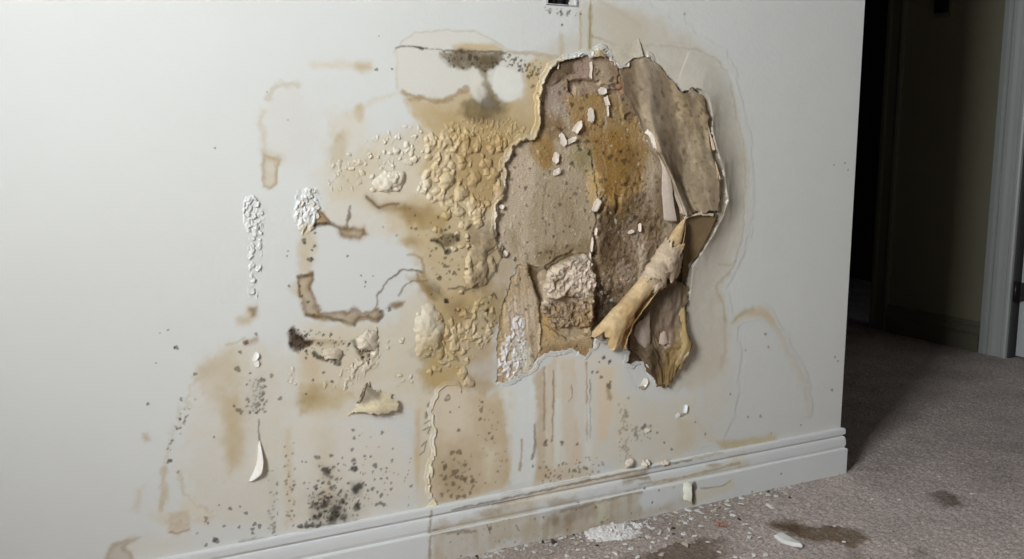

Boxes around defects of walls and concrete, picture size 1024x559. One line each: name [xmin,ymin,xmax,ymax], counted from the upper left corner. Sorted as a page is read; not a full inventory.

spalling [490,38,716,390]
leakage [102,0,876,559]
peeling [357,327,380,352]
peeling [347,382,400,417]
peeling [249,418,264,482]